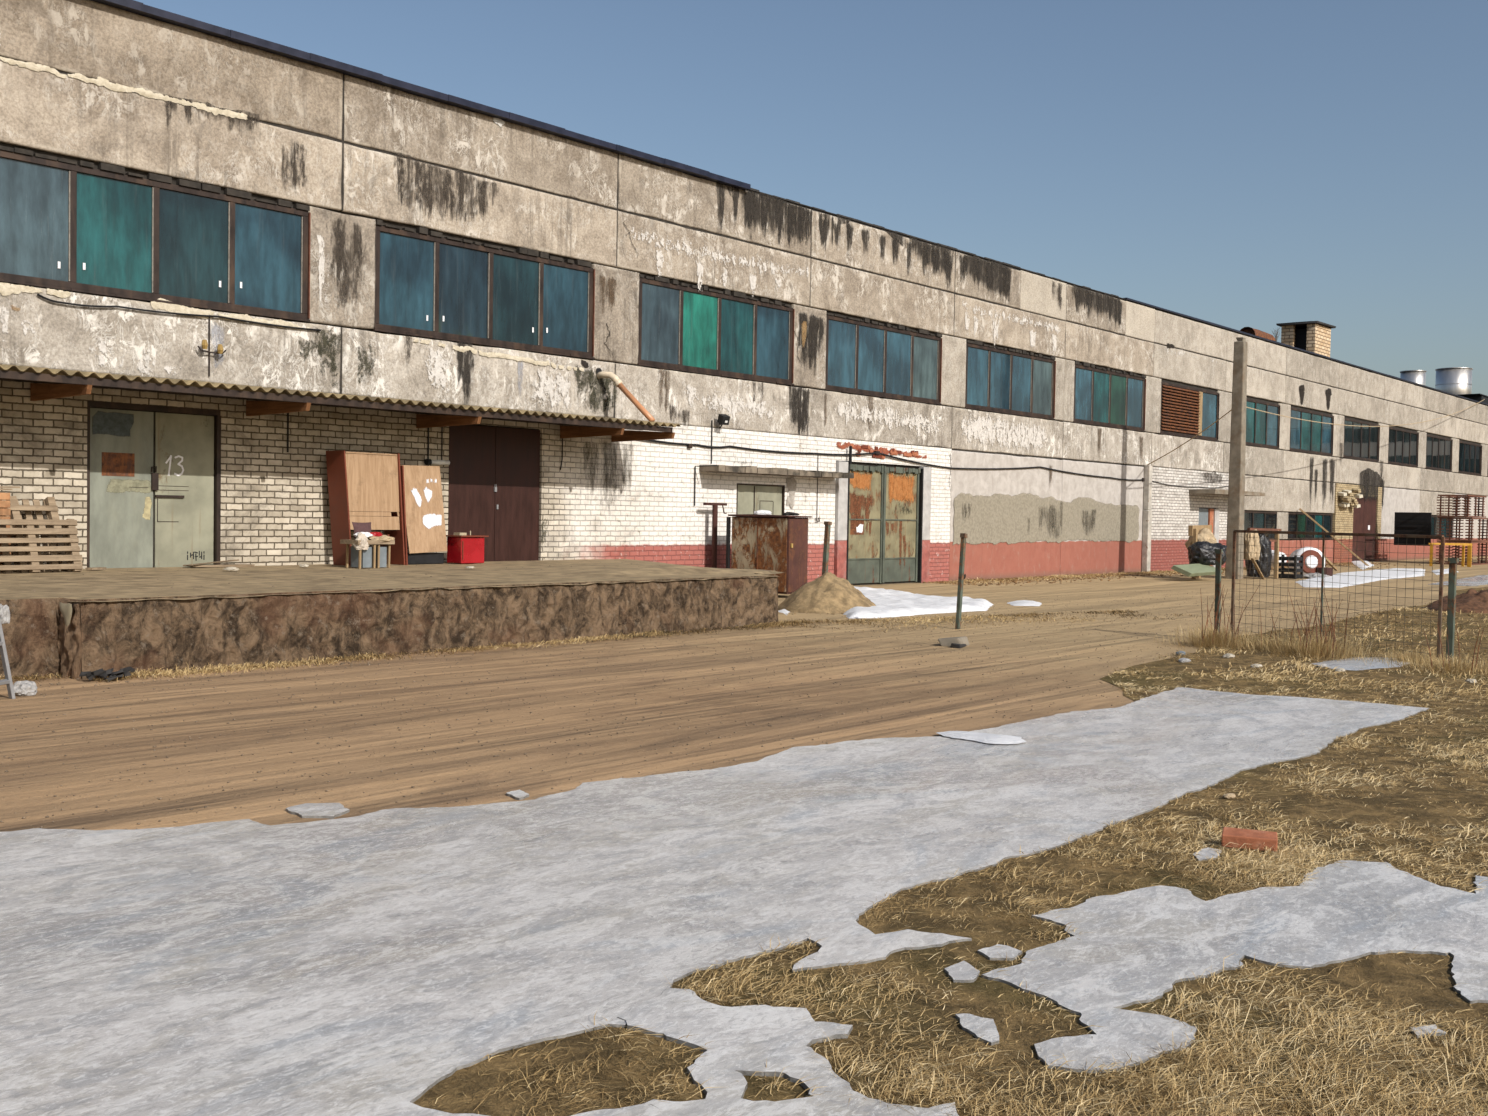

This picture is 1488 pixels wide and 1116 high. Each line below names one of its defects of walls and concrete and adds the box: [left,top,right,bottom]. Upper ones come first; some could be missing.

leakage [282,142,305,185]
leakage [397,152,497,221]
leakage [317,218,364,308]
leakage [716,182,1011,297]
leakage [1052,282,1122,328]
leakage [799,312,824,369]
leakage [575,366,618,412]
leakage [789,385,827,434]
leakage [584,442,632,487]
rust [850,472,915,568]